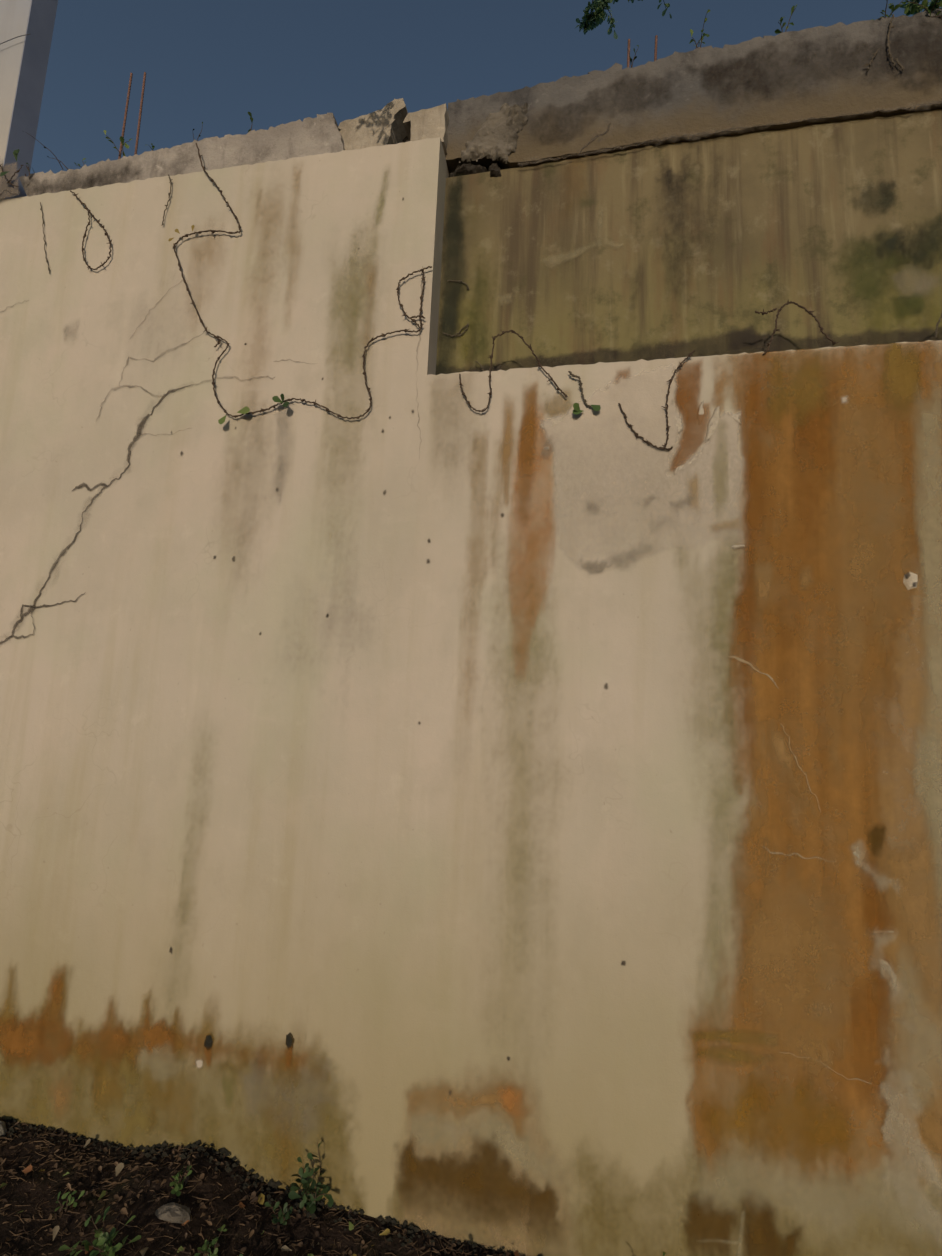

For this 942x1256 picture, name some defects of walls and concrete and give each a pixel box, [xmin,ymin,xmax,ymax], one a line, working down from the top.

spalling [448,103,529,178]
leakage [436,179,464,374]
crack [0,384,194,644]
rust [503,391,557,494]
rust [671,341,942,1176]
rust [0,975,214,1071]
leakage [0,1045,362,1213]
leakage [396,1102,564,1256]